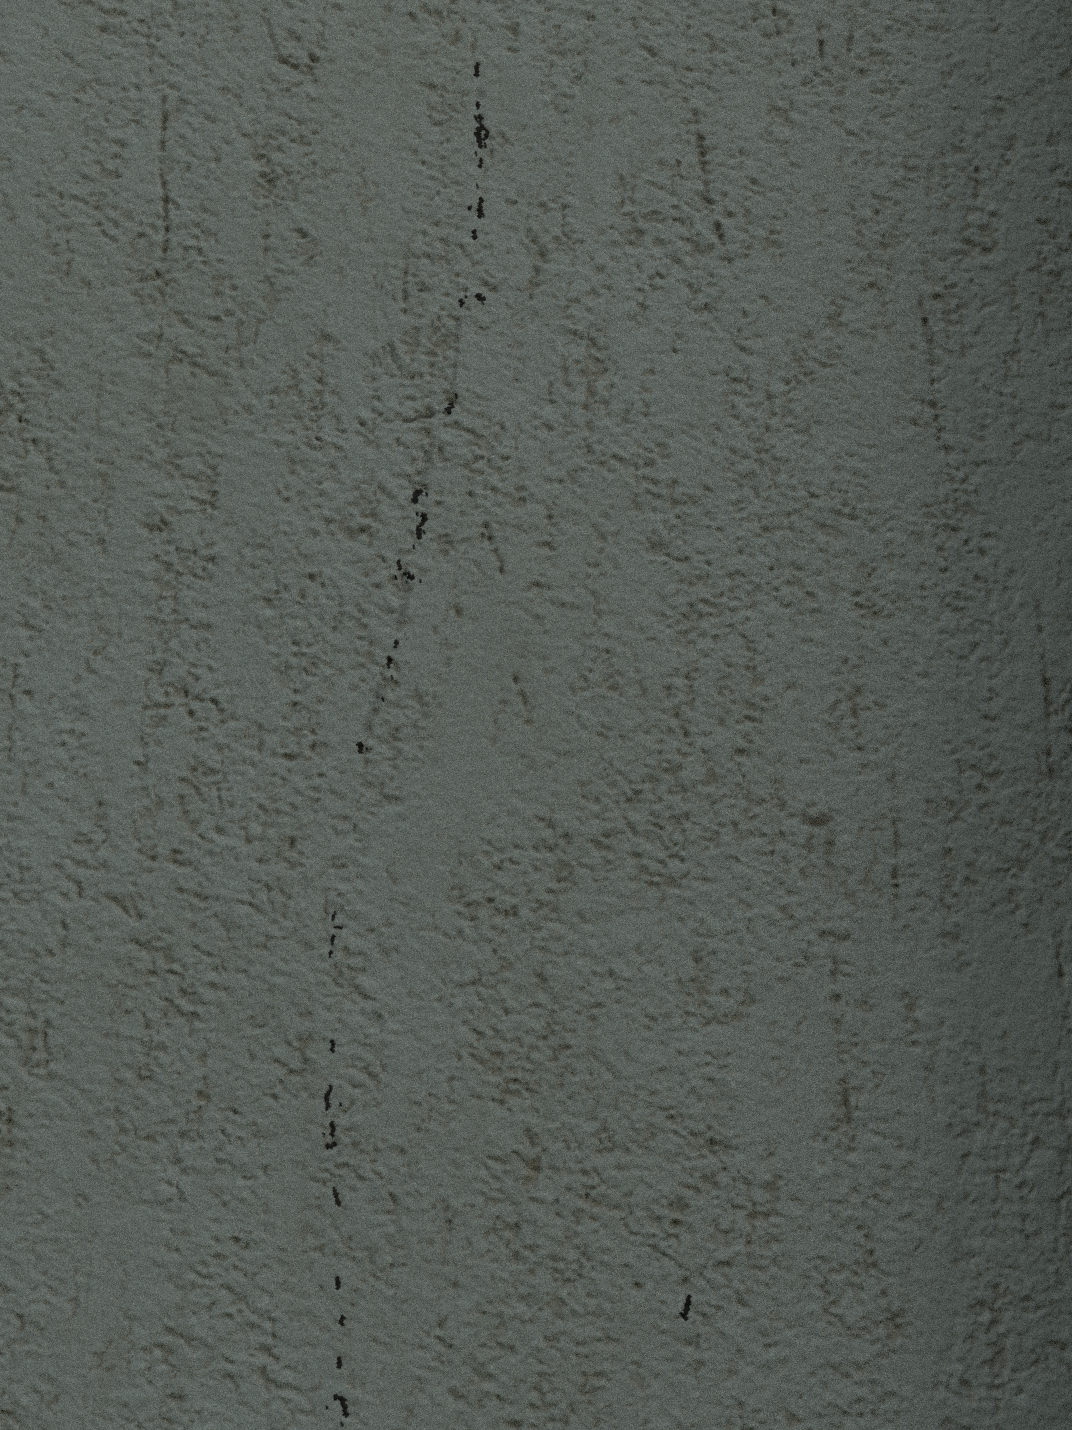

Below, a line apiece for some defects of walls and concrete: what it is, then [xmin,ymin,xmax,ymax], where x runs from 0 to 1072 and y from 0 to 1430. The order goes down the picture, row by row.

crack [468,62,490,240]
crack [458,293,486,308]
crack [445,393,457,414]
crack [395,488,428,584]
crack [381,639,399,701]
crack [356,742,368,754]
crack [328,911,343,958]
crack [322,1040,342,1150]
crack [332,1186,341,1207]
crack [326,1276,350,1427]